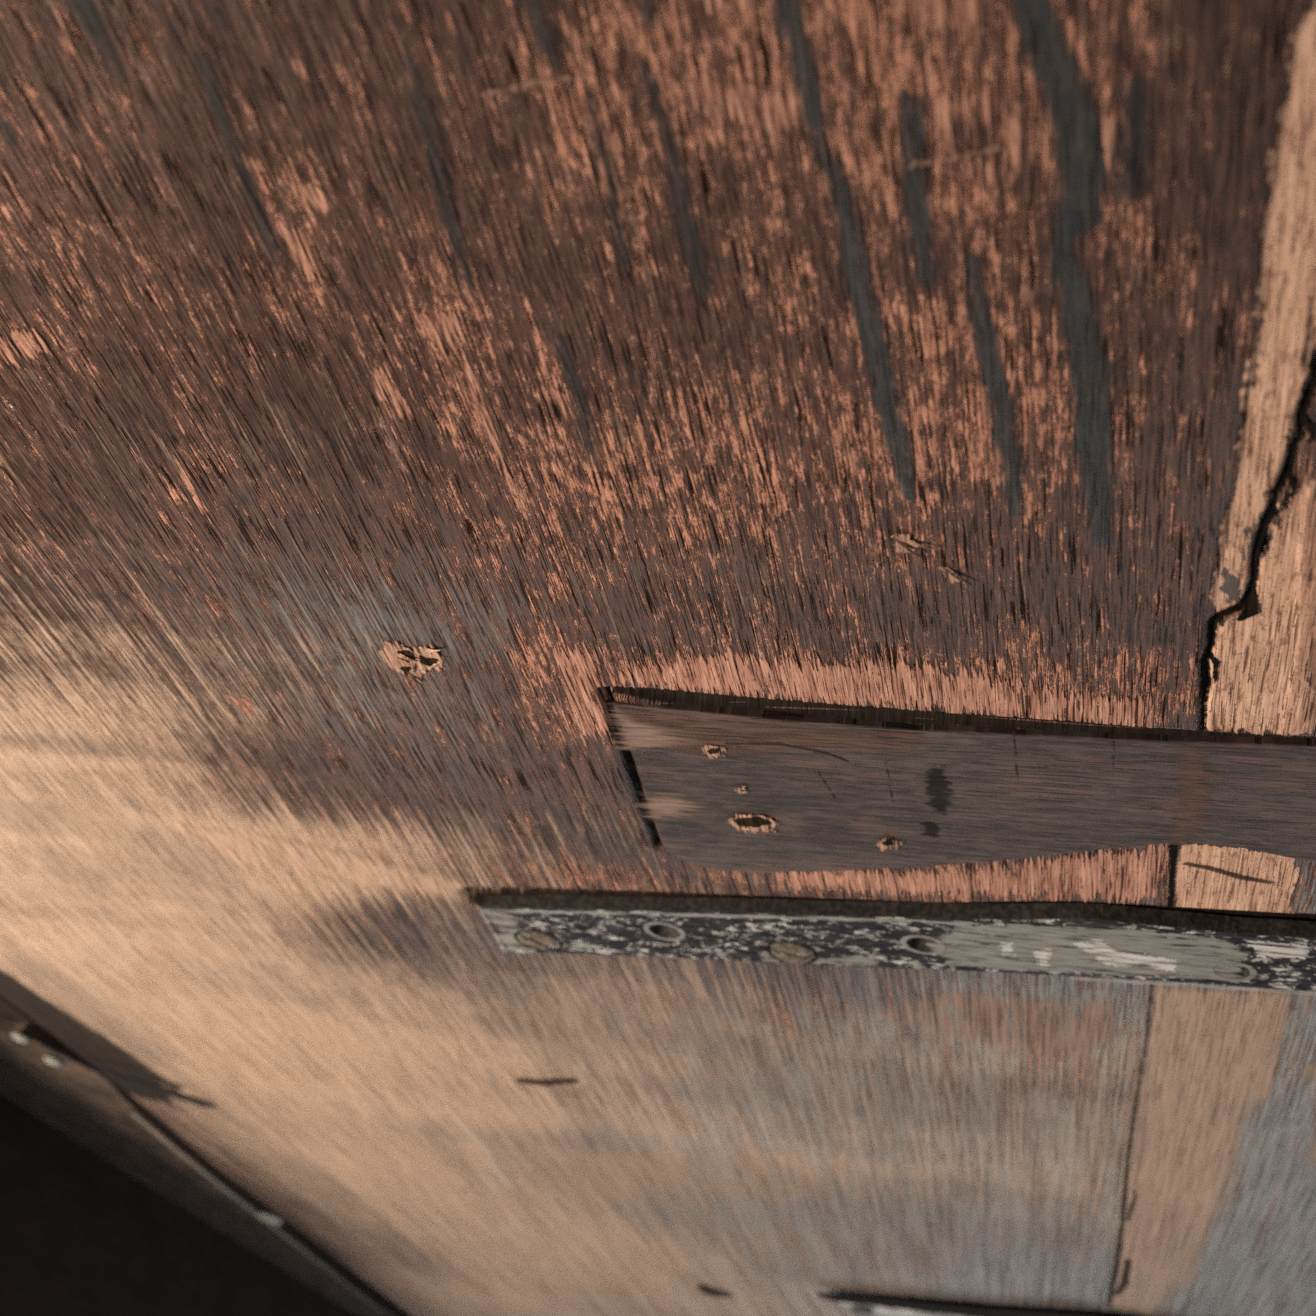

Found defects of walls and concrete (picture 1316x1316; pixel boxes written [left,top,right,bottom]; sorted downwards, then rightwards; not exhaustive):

peeling [1219,524,1260,604]
crack [1200,296,1316,731]